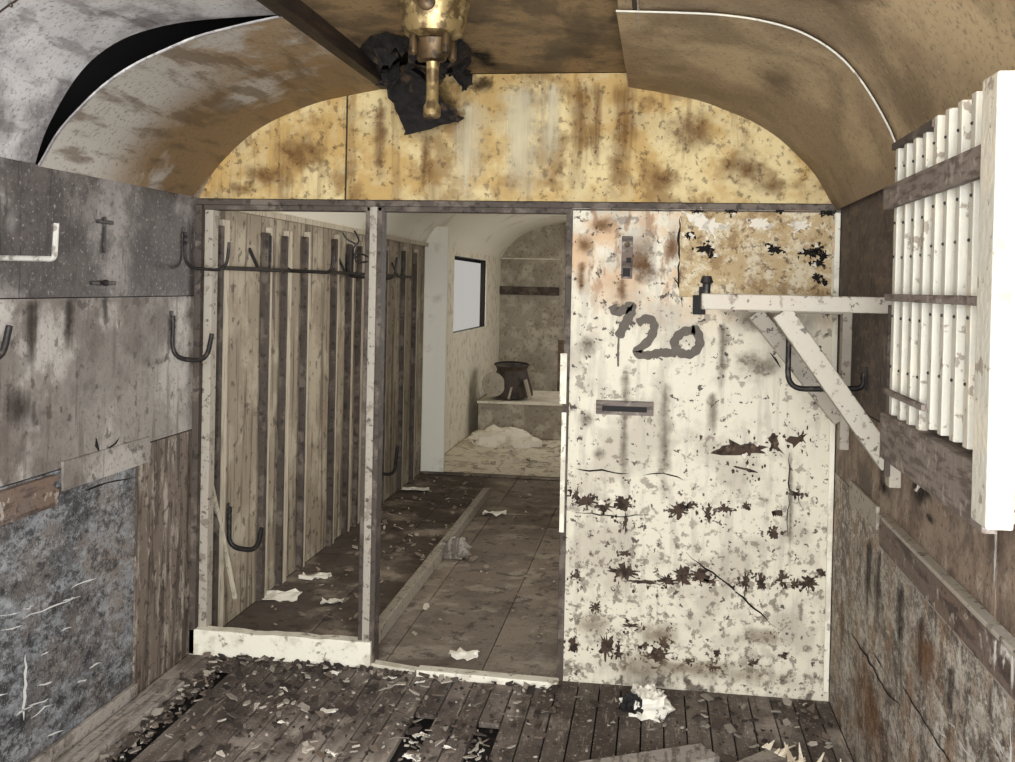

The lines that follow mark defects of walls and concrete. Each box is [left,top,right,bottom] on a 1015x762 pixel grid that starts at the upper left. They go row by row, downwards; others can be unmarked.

rust [287,144,317,165]
rust [376,107,386,165]
rust [678,119,706,140]
rust [737,163,753,177]
peeling [765,241,829,286]
peeling [711,426,811,482]
peeling [567,487,636,533]
peeling [667,497,751,523]
peeling [607,548,722,598]
peeling [733,568,826,596]
peeling [591,618,724,672]
crack [851,633,950,762]